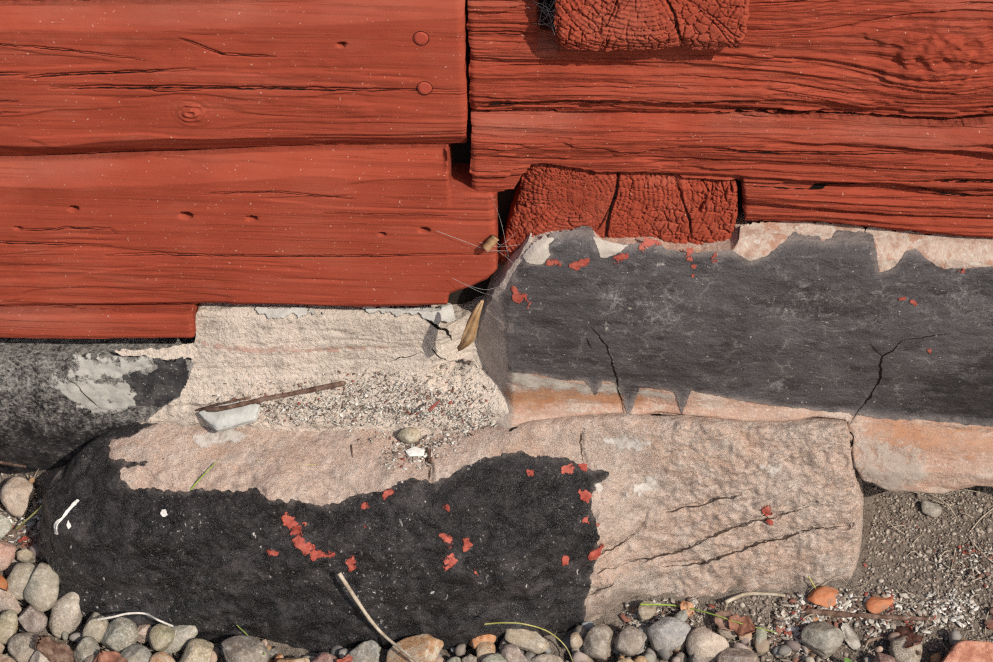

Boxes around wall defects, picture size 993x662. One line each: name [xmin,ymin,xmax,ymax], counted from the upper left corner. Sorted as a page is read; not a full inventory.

crack [600,172,619,238]
peeling [523,234,554,265]
peeling [593,237,628,258]
peeling [734,221,993,272]
peeling [255,305,324,318]
peeling [362,303,459,324]
peeling [50,343,197,414]
crack [586,329,624,412]
crack [849,333,951,448]